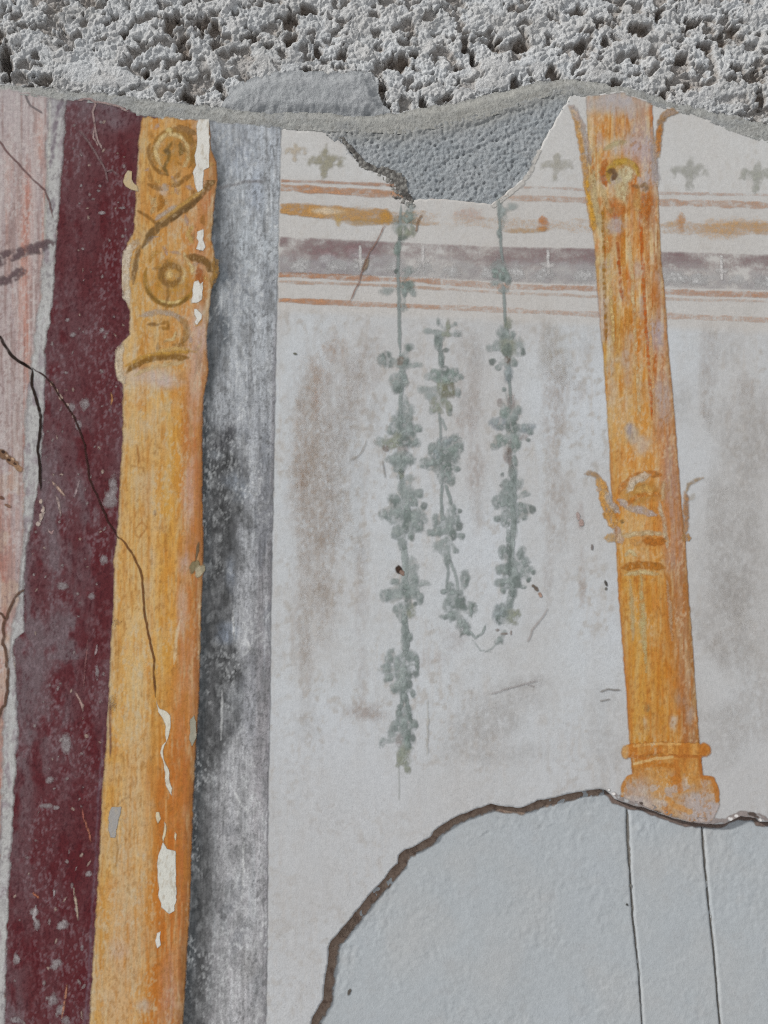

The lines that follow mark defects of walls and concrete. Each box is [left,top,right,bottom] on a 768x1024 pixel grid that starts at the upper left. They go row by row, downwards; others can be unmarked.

peeling [123,171,138,191]
peeling [193,119,210,192]
flaking render [321,89,572,208]
peeling [191,281,203,324]
peeling [196,230,205,251]
crack [351,226,385,299]
crack [0,336,156,692]
crack [0,590,24,715]
peeling [157,705,172,795]
peeling [189,716,197,745]
peeling [156,812,177,914]
crack [311,789,768,1024]